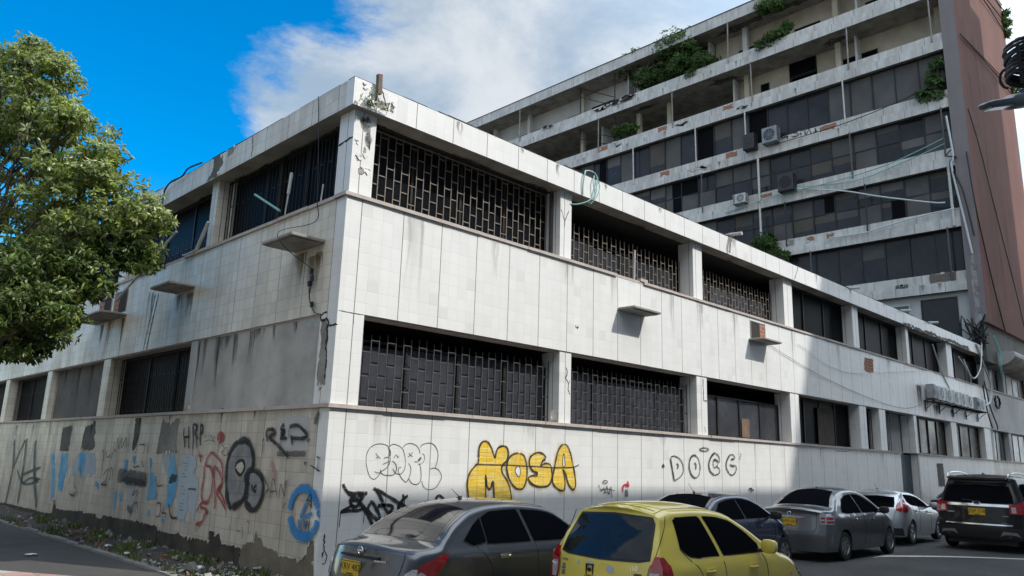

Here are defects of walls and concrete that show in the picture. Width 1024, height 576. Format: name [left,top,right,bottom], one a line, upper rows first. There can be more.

spalling [363,82,396,113]
peeling [355,137,371,175]
spalling [0,497,314,576]